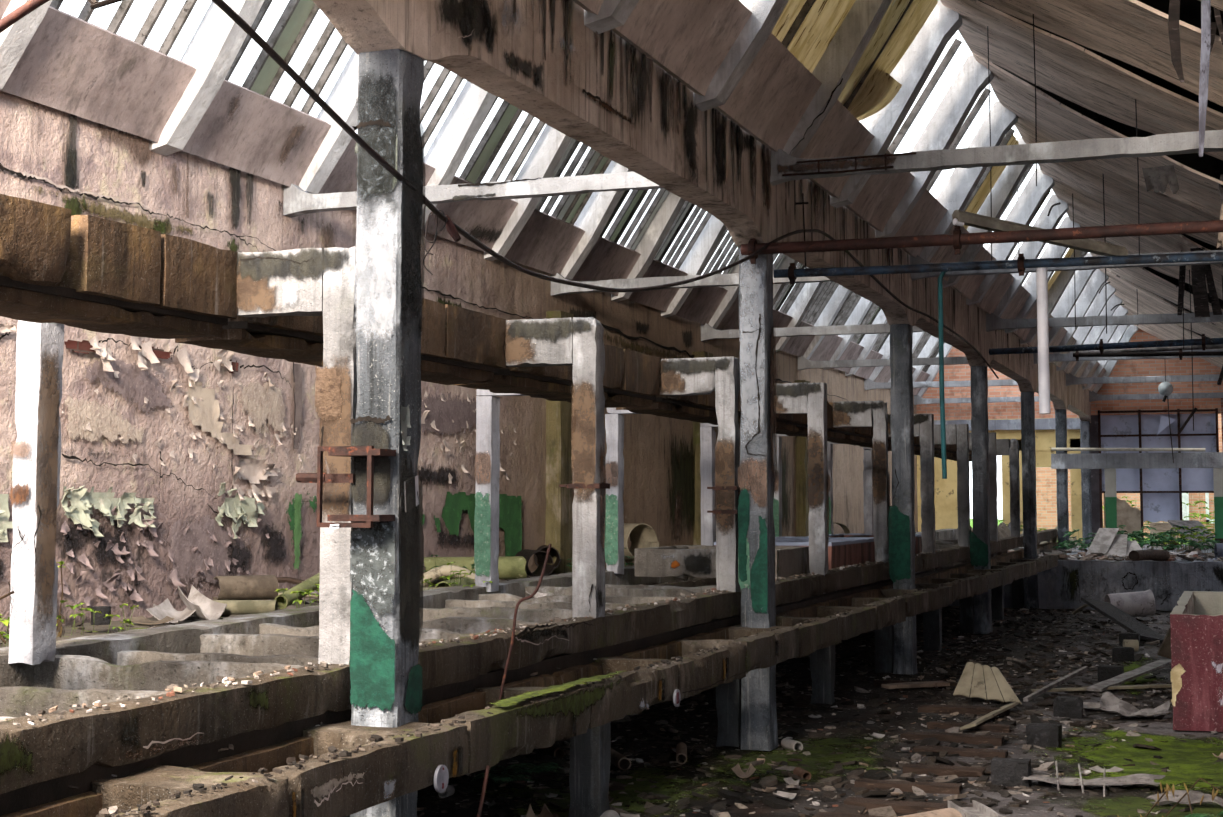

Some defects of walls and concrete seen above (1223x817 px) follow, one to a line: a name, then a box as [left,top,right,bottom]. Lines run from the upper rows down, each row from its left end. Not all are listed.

water stain [439,0,573,91]
water stain [64,114,79,190]
water stain [99,123,152,187]
crack [0,163,316,264]
water stain [172,155,189,218]
water stain [229,167,254,229]
water stain [596,29,908,292]
peeling [57,335,476,606]
peeling [0,494,13,542]